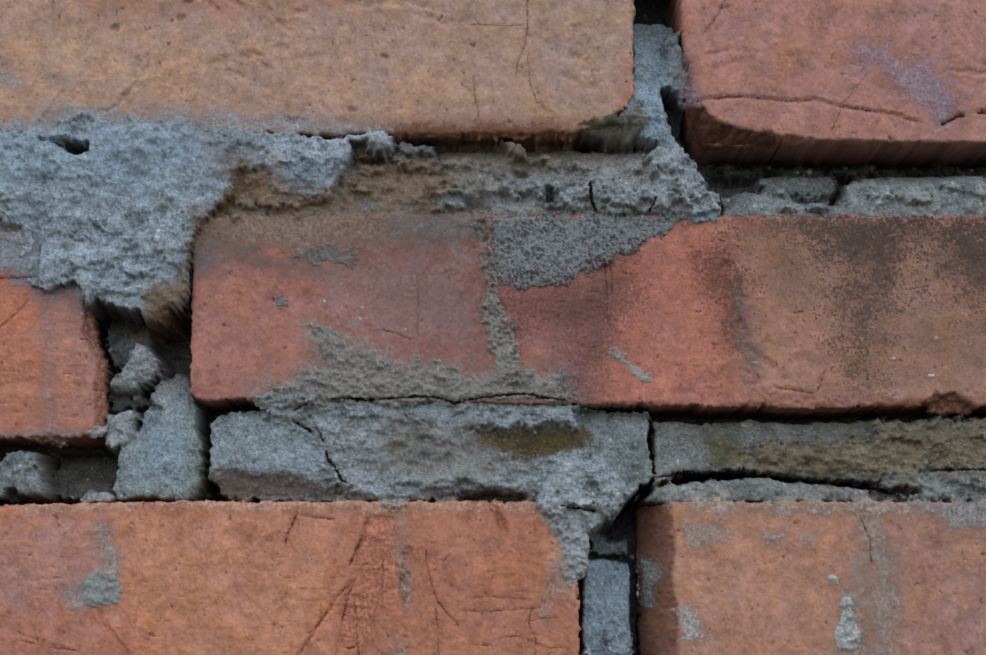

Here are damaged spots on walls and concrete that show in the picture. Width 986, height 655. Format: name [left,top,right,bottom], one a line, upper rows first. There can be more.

crack [697,75,986,129]
crack [588,180,597,212]